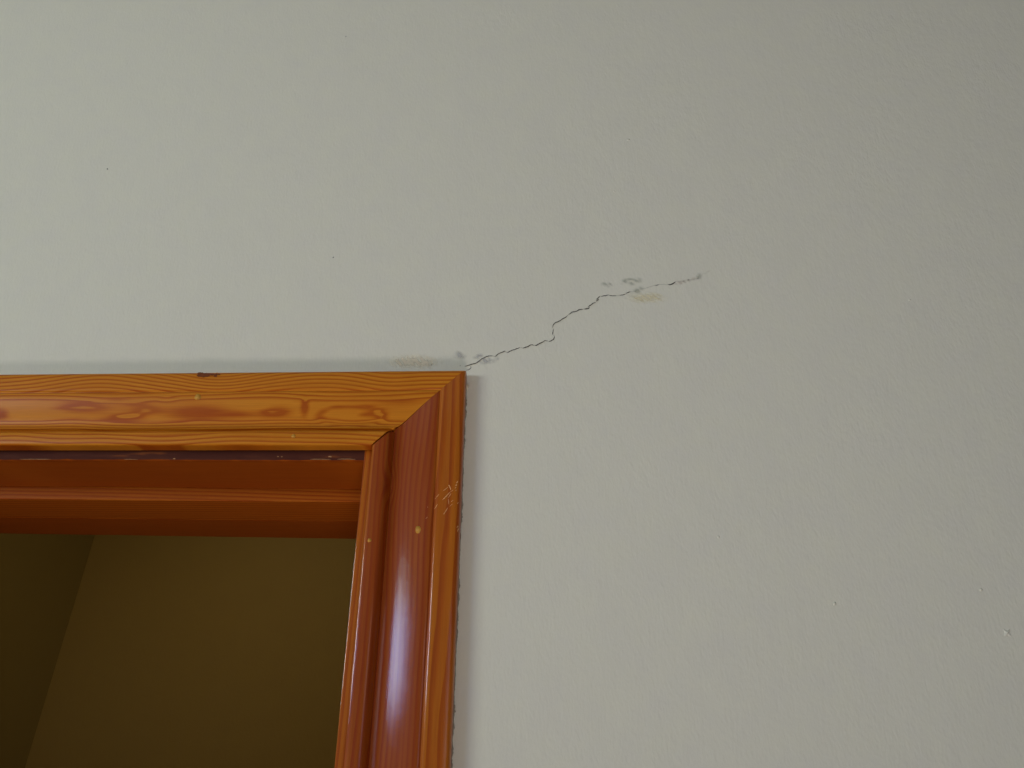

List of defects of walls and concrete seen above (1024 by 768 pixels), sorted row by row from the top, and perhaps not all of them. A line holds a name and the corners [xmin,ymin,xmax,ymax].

crack [466,271,709,370]